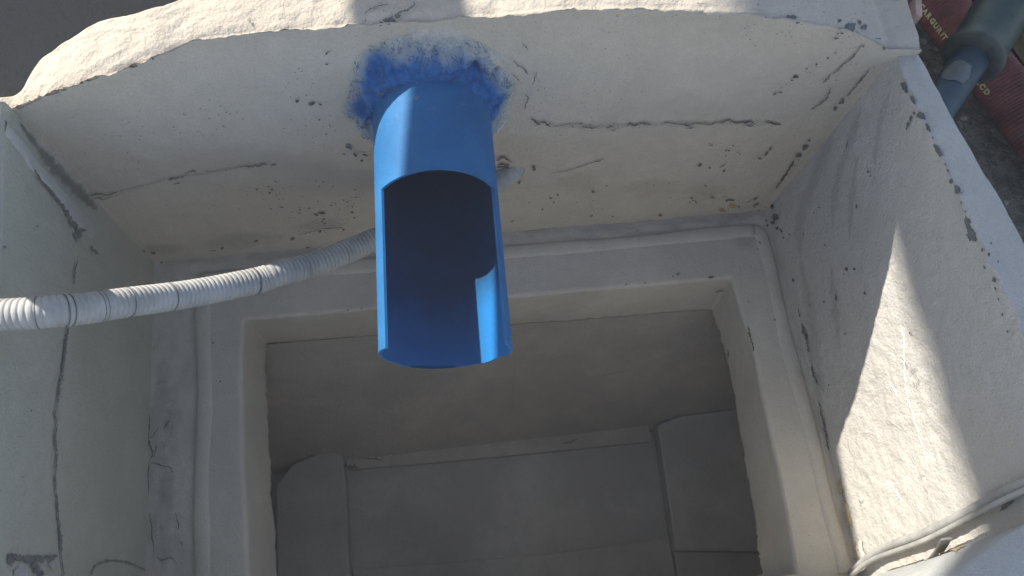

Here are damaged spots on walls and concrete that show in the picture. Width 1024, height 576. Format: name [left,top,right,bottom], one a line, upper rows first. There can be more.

crack [450,44,781,131]
crack [91,162,276,200]
crack [54,326,69,576]